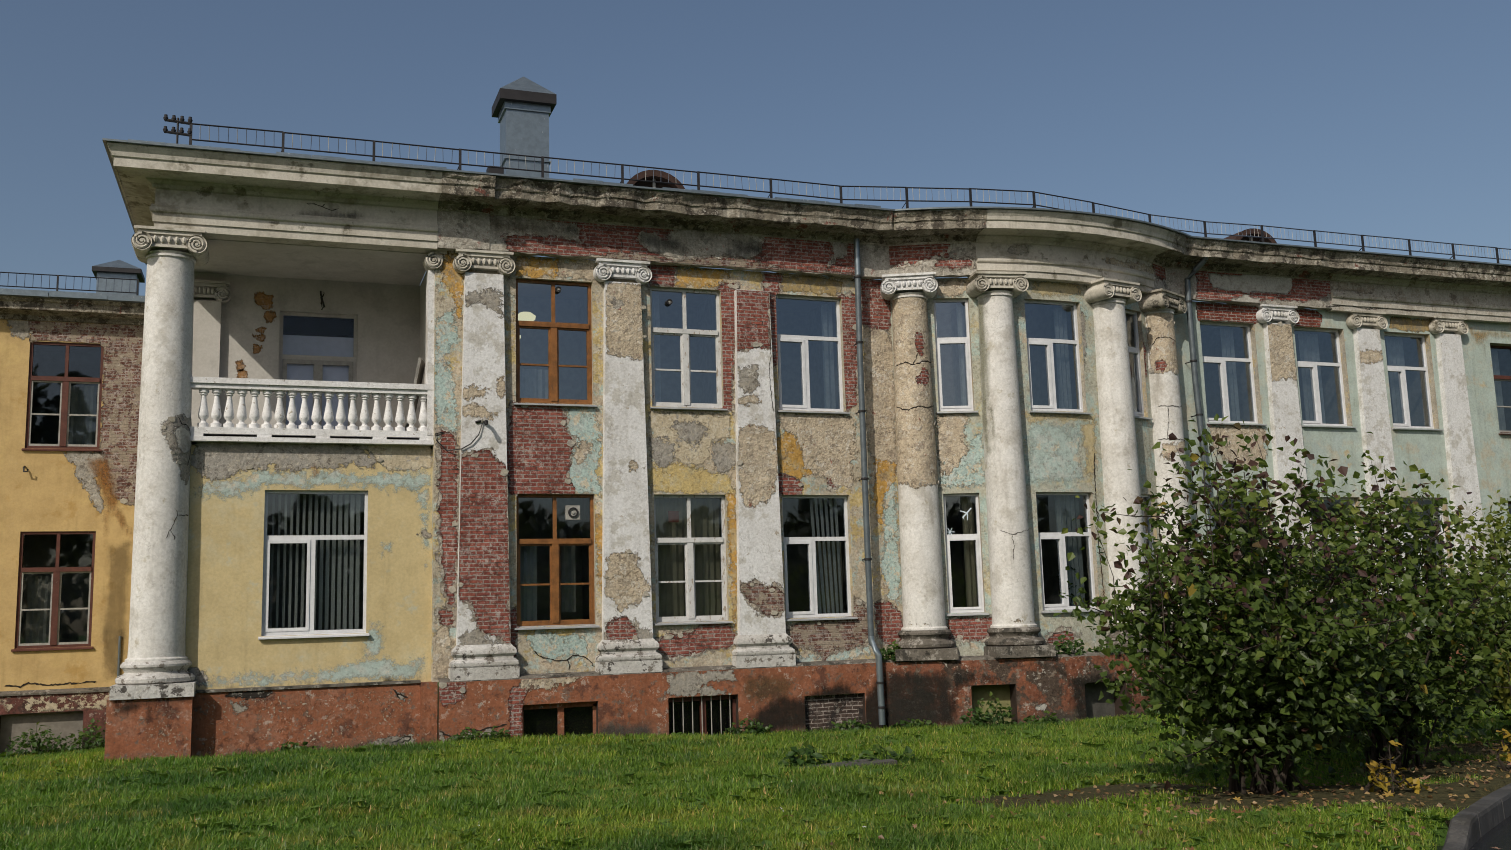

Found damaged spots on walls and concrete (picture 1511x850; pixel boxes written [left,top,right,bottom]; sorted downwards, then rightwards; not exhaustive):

spalling [3,320,144,513]
spalling [160,219,992,753]
spalling [1195,271,1383,382]
peeling [0,692,110,713]